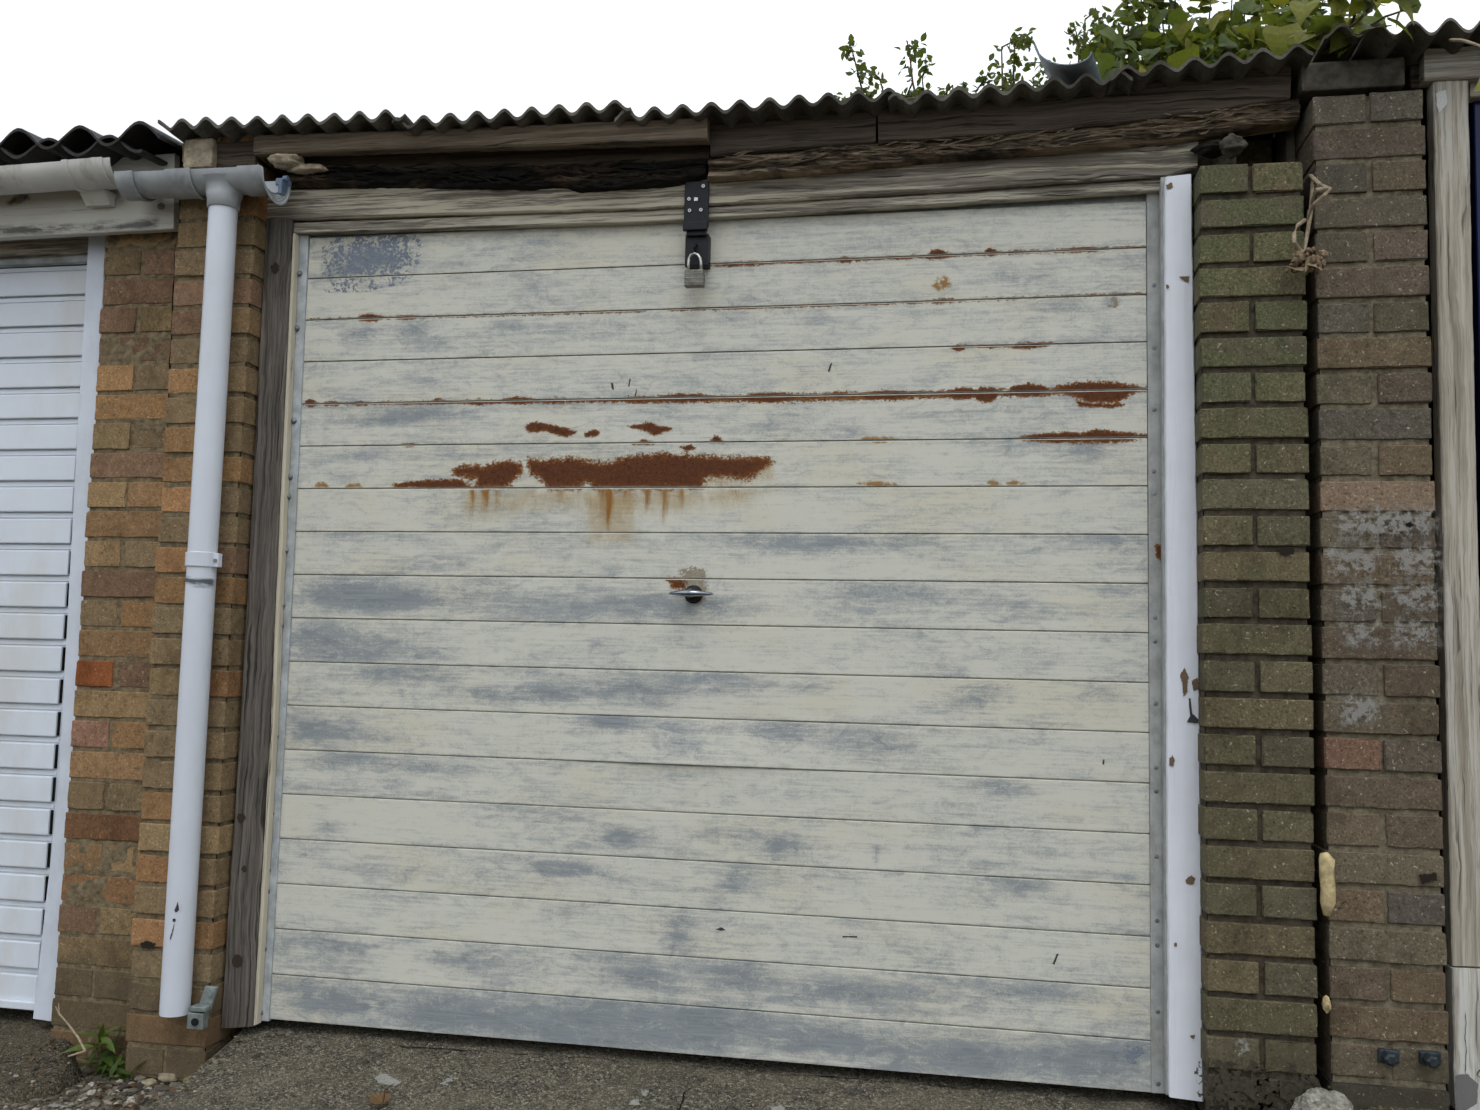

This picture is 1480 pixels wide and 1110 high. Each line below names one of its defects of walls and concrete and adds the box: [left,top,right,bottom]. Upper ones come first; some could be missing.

rust [303,379,1147,524]
peeling [1455,1074,1478,1110]